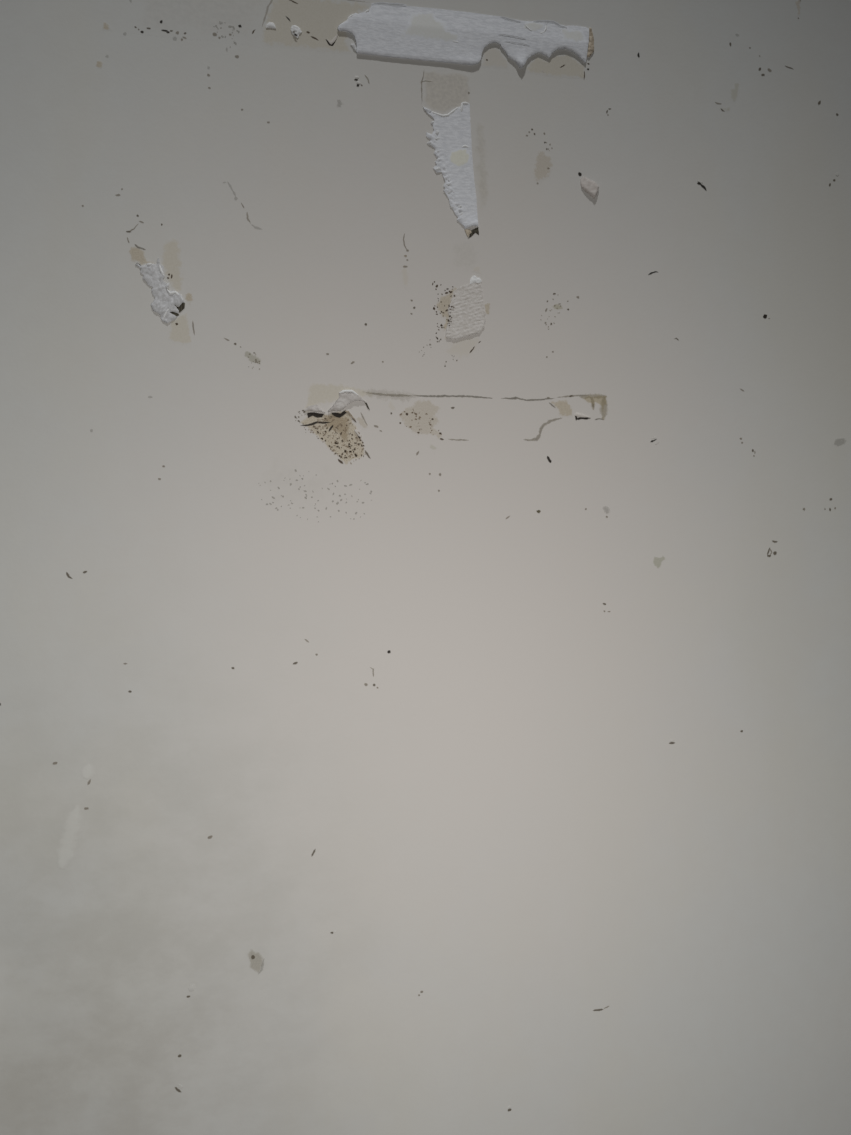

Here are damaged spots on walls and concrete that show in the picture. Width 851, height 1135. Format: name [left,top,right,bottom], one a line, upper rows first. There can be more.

peeling [326,2,594,70]
peeling [423,102,479,238]
peeling [126,231,194,346]
peeling [421,263,491,367]
peeling [295,381,376,467]